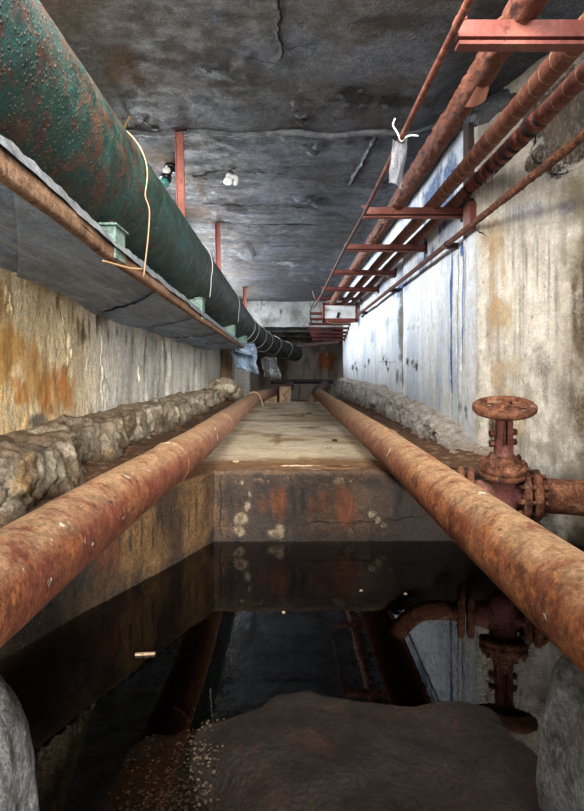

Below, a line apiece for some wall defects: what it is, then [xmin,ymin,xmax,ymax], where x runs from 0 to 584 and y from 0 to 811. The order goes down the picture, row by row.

crack [248,0,320,64]
spalling [525,89,584,179]
rust [484,222,508,328]
rust [40,369,75,413]